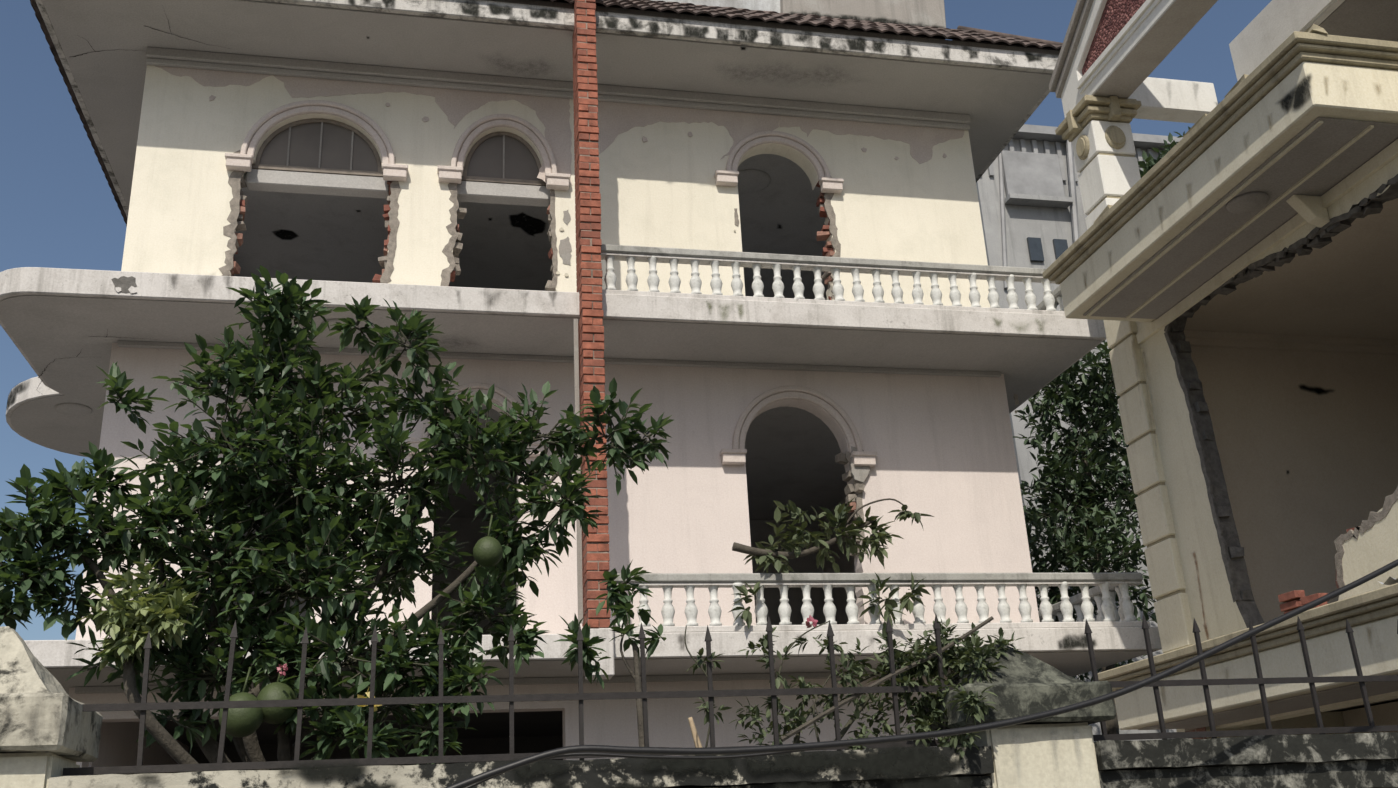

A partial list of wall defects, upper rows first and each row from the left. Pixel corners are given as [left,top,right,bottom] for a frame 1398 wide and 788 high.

peeling [598,101,964,164]
peeling [156,66,572,291]
spalling [816,175,841,300]
spalling [111,276,137,294]
spalling [1164,174,1398,603]
water stain [281,762,395,788]
water stain [515,743,972,788]